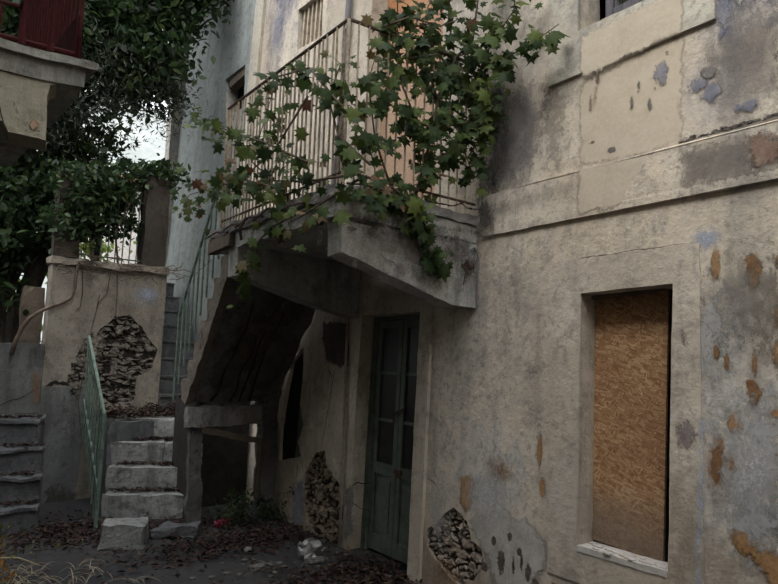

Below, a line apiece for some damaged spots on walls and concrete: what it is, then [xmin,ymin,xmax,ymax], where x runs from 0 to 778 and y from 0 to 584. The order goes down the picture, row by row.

peeling [687,67,724,102]
peeling [679,98,778,168]
peeling [711,248,721,280]
peeling [745,252,763,289]
spalling [66,314,157,405]
peeling [322,321,350,368]
peeling [713,345,730,371]
peeling [746,353,762,413]
peeling [711,412,744,484]
spalling [208,451,410,583]
peeling [427,474,548,584]
peeling [730,529,778,584]